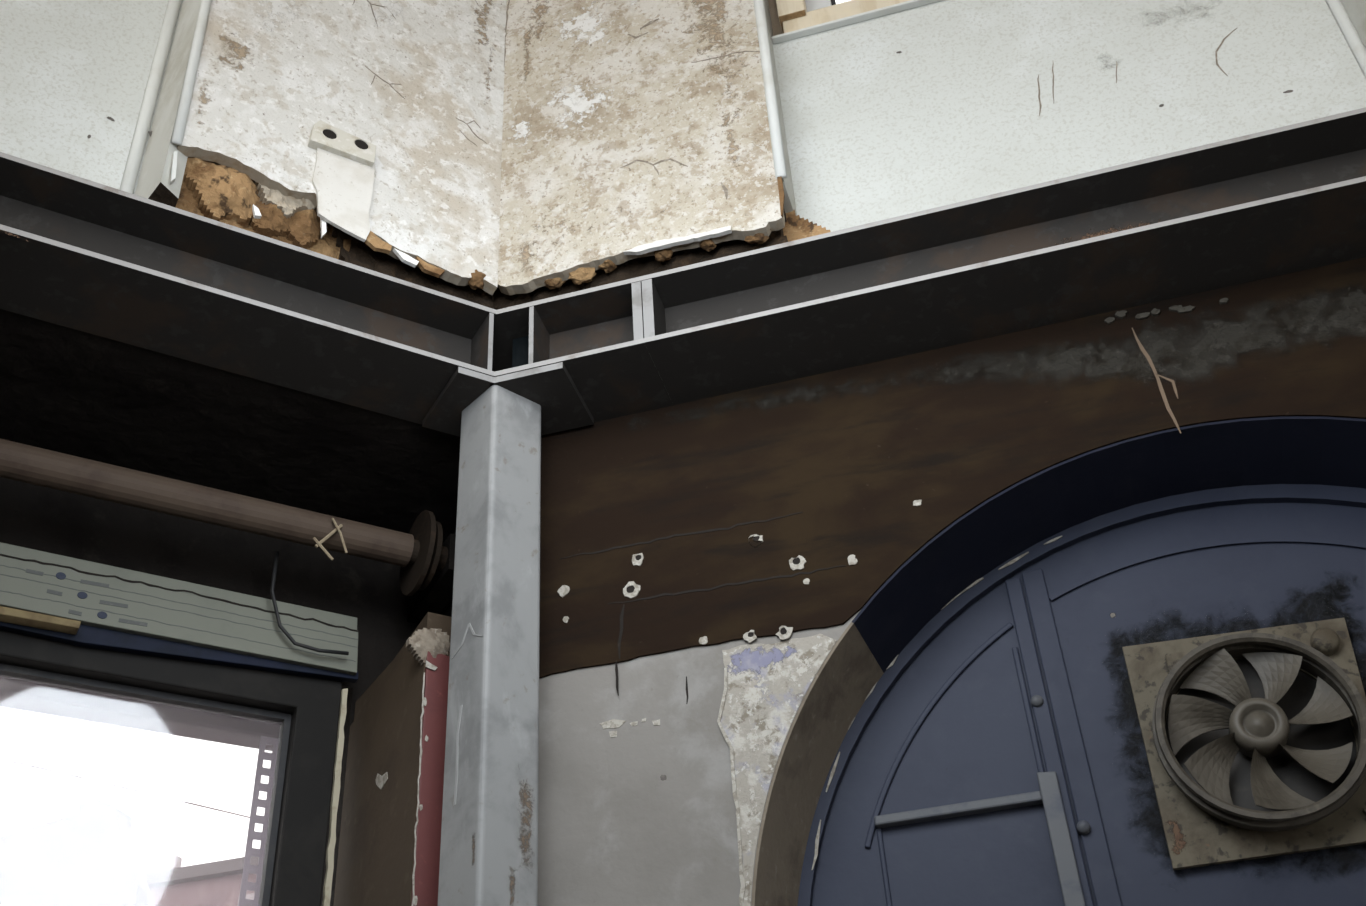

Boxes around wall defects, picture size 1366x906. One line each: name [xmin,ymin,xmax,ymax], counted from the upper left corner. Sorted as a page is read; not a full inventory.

leakage [523,1,548,78]
leakage [682,0,744,166]
spalling [170,151,831,310]
leakage [521,196,591,272]
spalling [557,585,570,598]
spalling [623,553,644,598]
spalling [789,555,810,585]
spalling [942,552,1029,609]
peeling [699,626,837,906]
spalling [826,752,840,792]